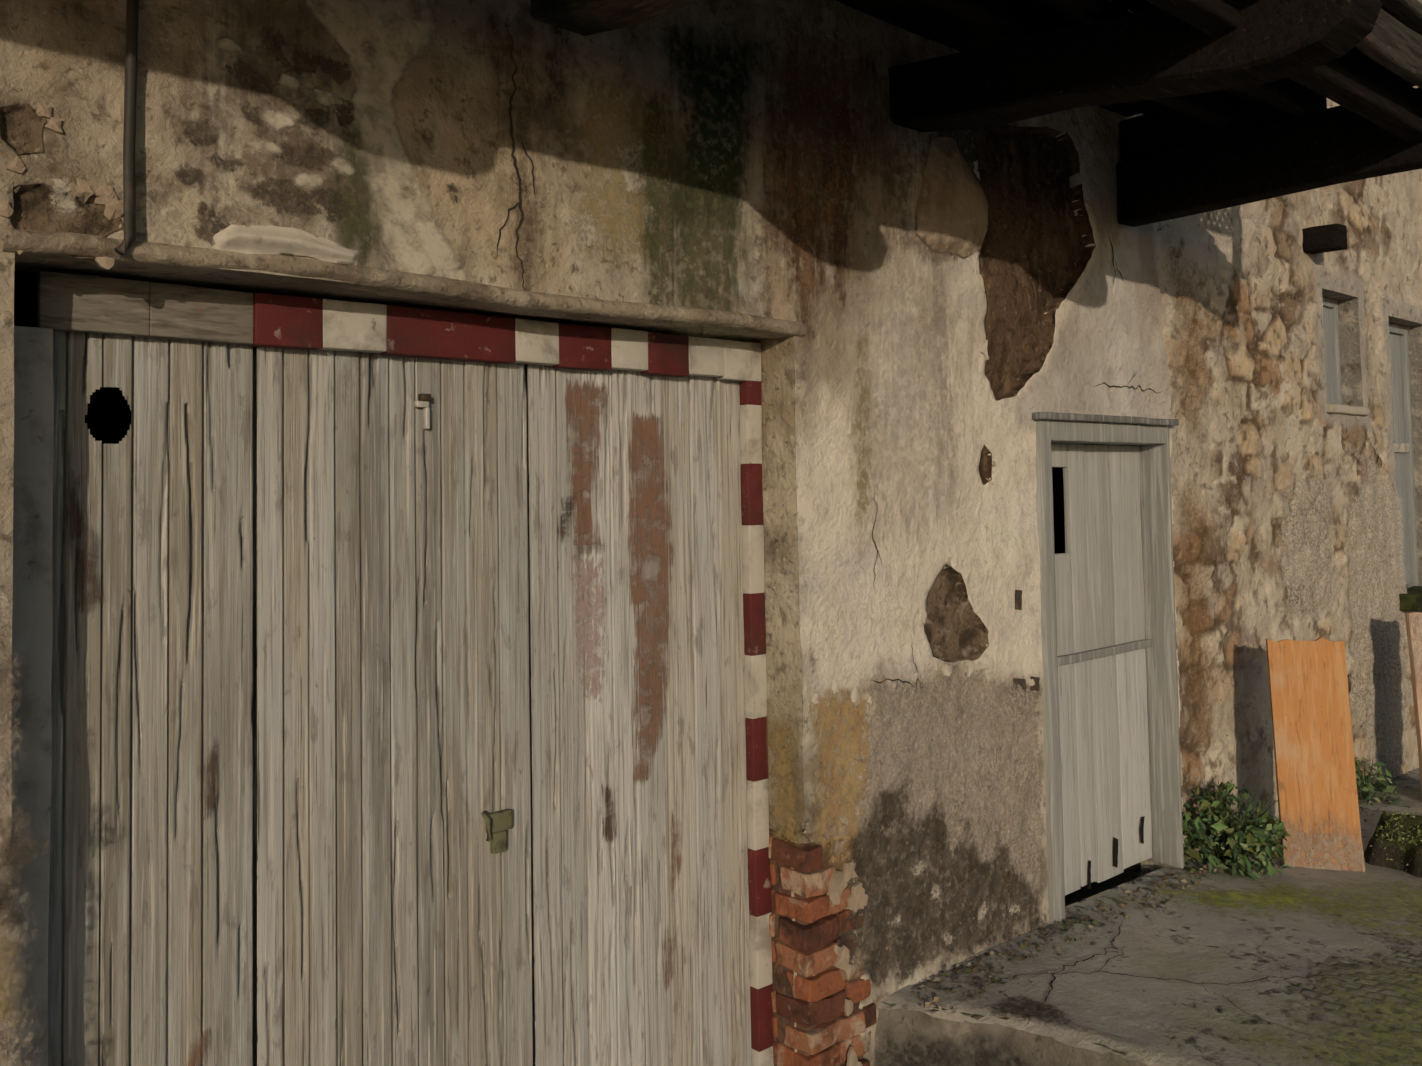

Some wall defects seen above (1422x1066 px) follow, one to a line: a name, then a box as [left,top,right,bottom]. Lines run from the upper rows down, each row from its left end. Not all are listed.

spalling [0,103,123,237]
spalling [70,255,115,271]
crack [497,23,536,291]
damp [583,26,753,326]
spalling [939,124,1096,401]
peeling [769,556,1046,1066]
damp [840,786,1044,986]
crack [947,921,1422,1038]